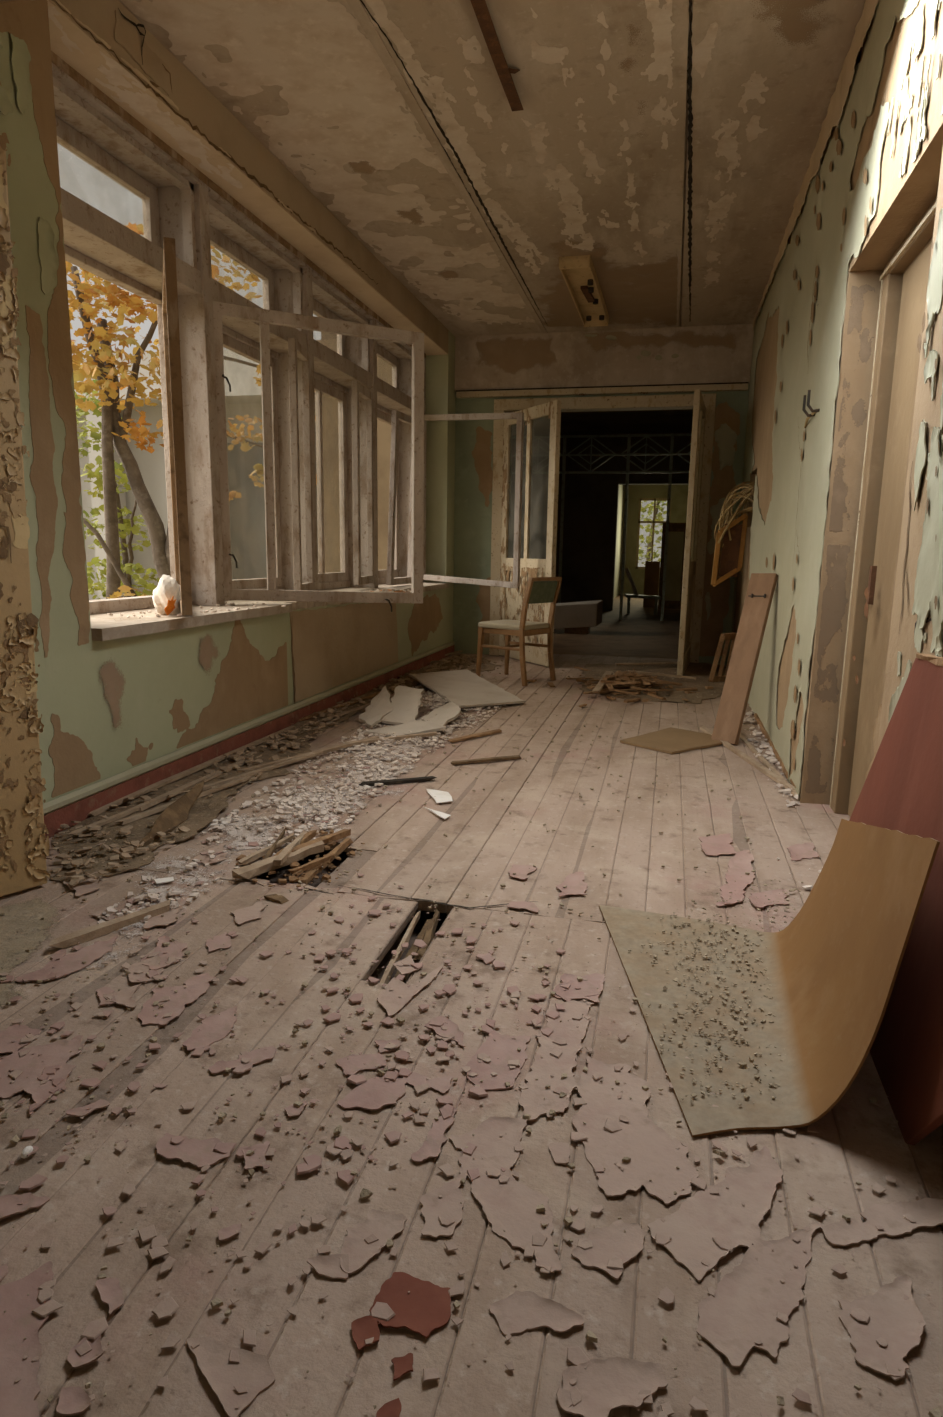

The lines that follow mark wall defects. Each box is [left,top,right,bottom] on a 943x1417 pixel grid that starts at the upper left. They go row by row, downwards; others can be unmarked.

flaking render [0,0,179,798]
flaking render [169,620,288,749]
flaking render [408,594,443,656]
flaking render [472,426,545,648]